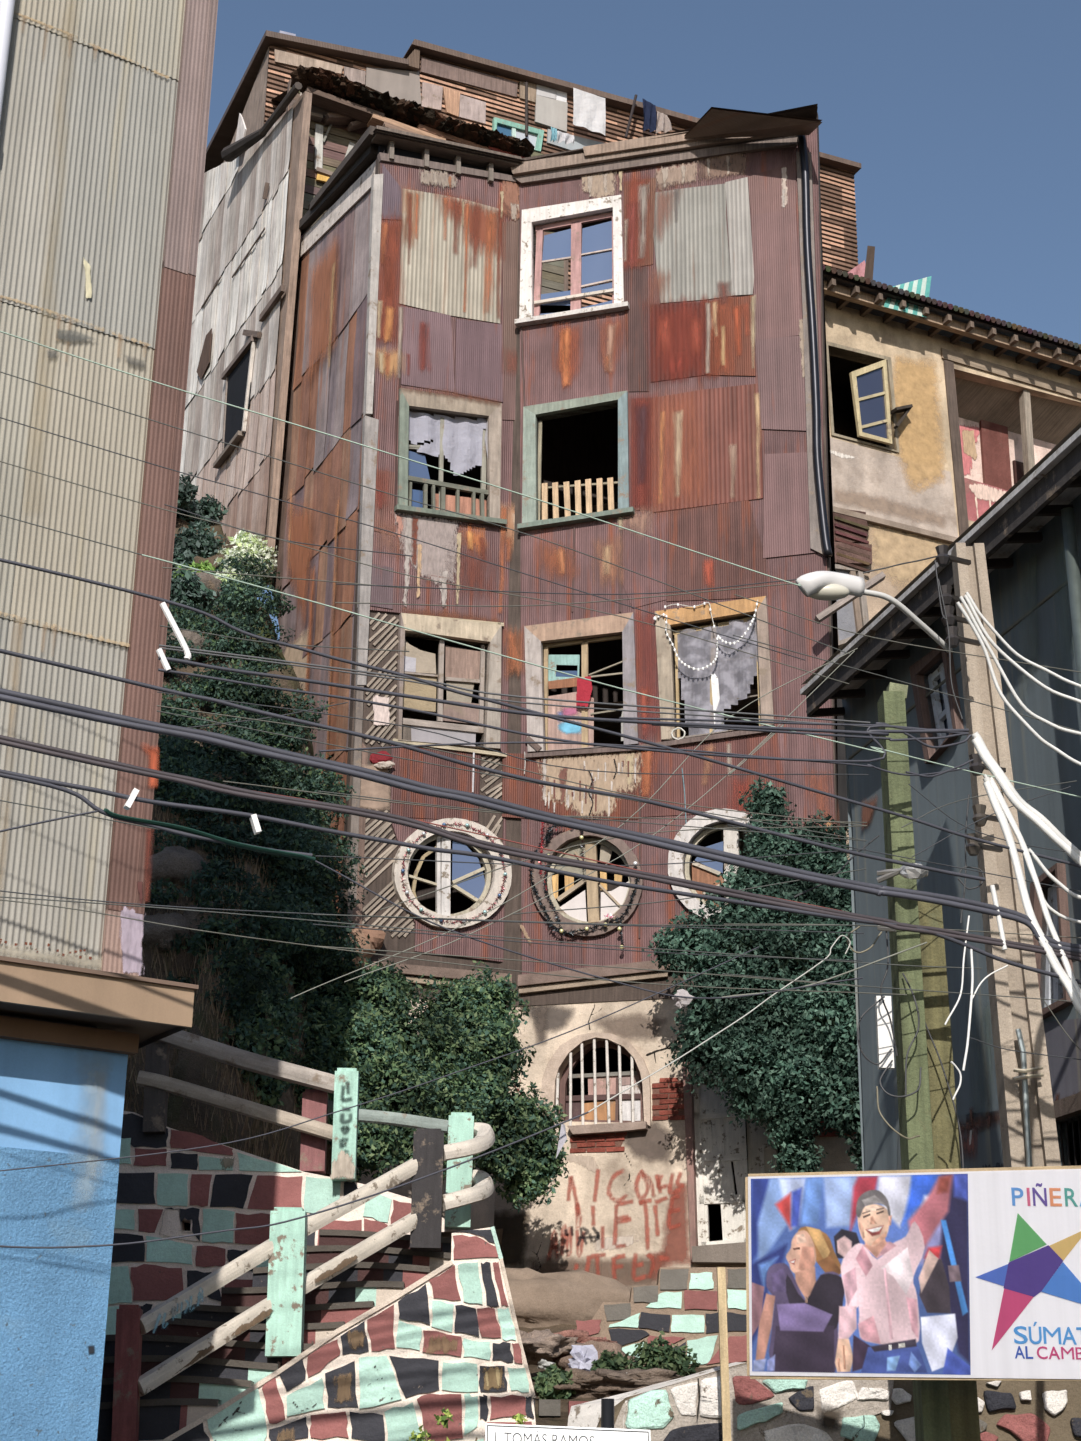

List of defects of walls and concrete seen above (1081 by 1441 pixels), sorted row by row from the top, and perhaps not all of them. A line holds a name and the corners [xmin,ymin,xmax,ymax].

rust [444,194,502,316]
rust [308,243,336,375]
rust [560,328,577,384]
rust [652,283,754,376]
peeling [894,360,943,487]
peeling [959,425,1006,519]
peeling [395,512,461,606]
rust [408,508,515,622]
peeling [538,751,643,824]
leakage [625,1122,673,1160]
spalling [652,1078,685,1121]